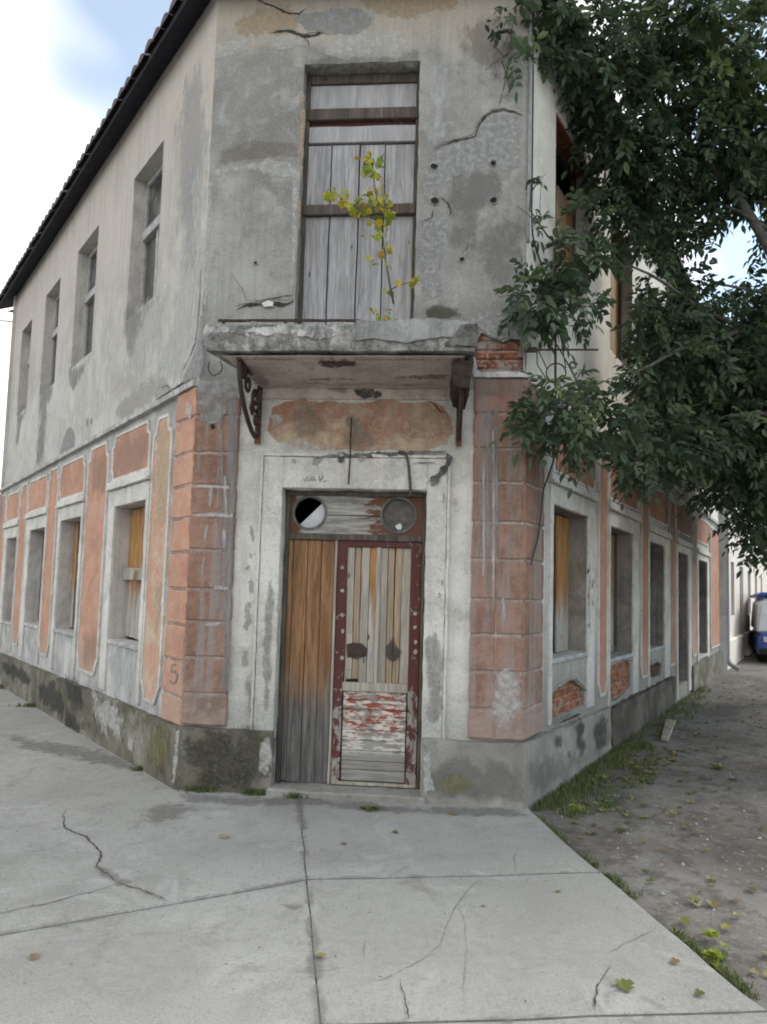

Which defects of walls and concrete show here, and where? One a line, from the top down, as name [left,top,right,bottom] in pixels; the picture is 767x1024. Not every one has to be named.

crack [259,0,324,44]
flaking render [445,312,527,373]
leakage [2,649,136,751]
efflorescence [491,669,519,726]
flaking render [552,664,608,758]
flaking render [610,658,632,704]